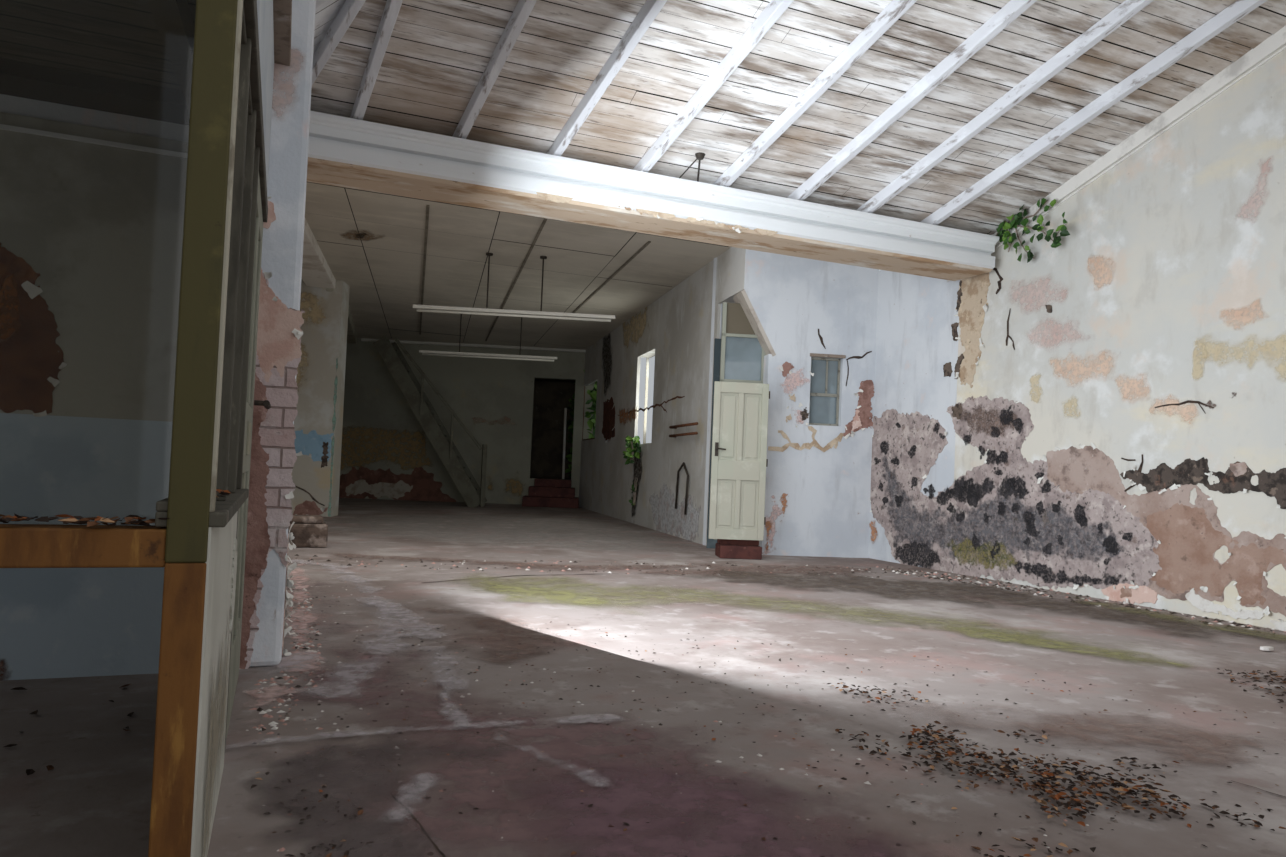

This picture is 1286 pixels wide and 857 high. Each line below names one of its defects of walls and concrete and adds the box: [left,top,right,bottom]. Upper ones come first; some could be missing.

flaking render [0,242,67,417]
peeling [780,362,814,427]
flaking render [843,380,875,439]
spalling [951,404,963,420]
peeling [1030,375,1041,402]
peeling [1050,352,1196,421]
flaking render [229,268,456,669]
flaking render [1037,443,1286,628]